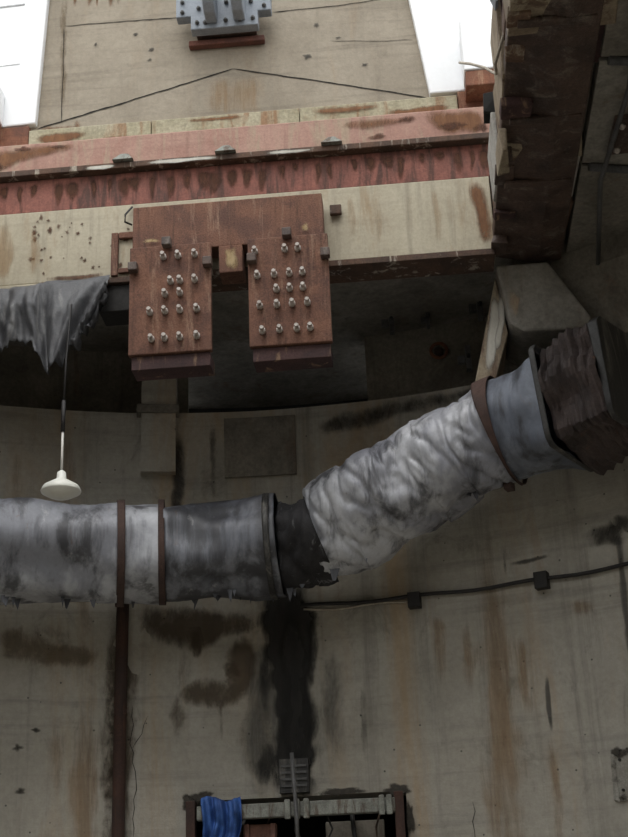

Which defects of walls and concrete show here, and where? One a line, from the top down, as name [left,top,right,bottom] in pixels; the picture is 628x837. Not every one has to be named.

rust [318,105,374,113]
rust [350,105,487,139]
rust [454,150,488,168]
water stain [592,517,628,645]
water stain [145,610,250,655]
water stain [185,588,317,785]